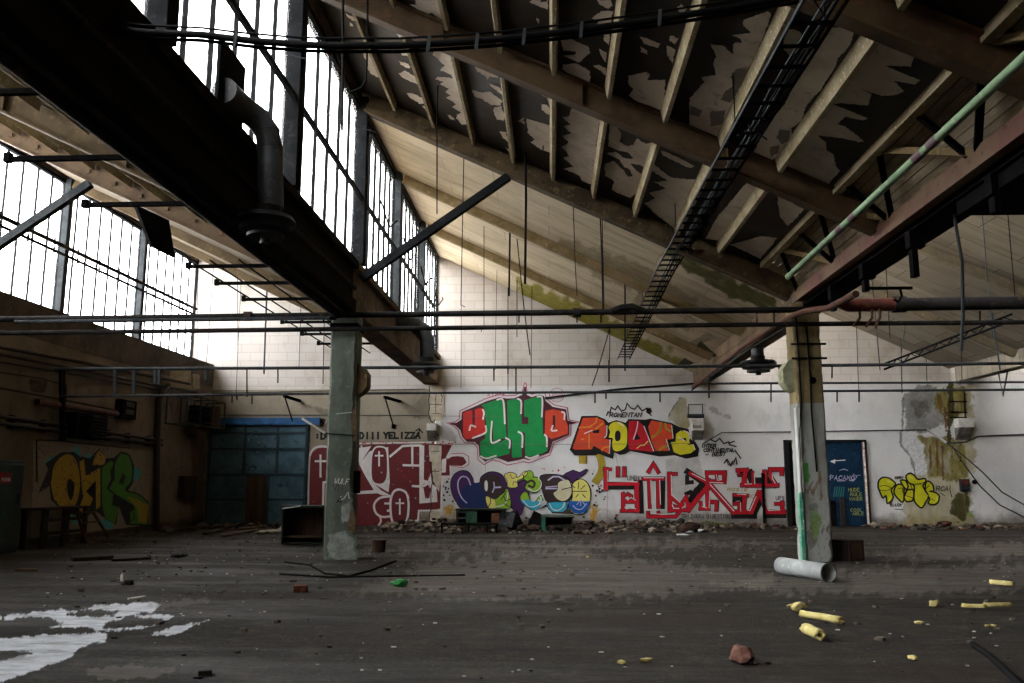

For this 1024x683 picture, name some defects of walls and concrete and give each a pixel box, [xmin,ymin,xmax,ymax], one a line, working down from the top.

peeling [363,54,378,77]
peeling [398,53,426,110]
peeling [409,0,442,19]
peeling [433,51,466,125]
peeling [472,67,695,228]
peeling [561,0,614,82]
peeling [689,11,771,137]
peeling [754,28,854,160]
peeling [788,43,920,184]
peeling [706,183,777,259]
leakage [550,230,707,342]
leakage [894,379,986,525]